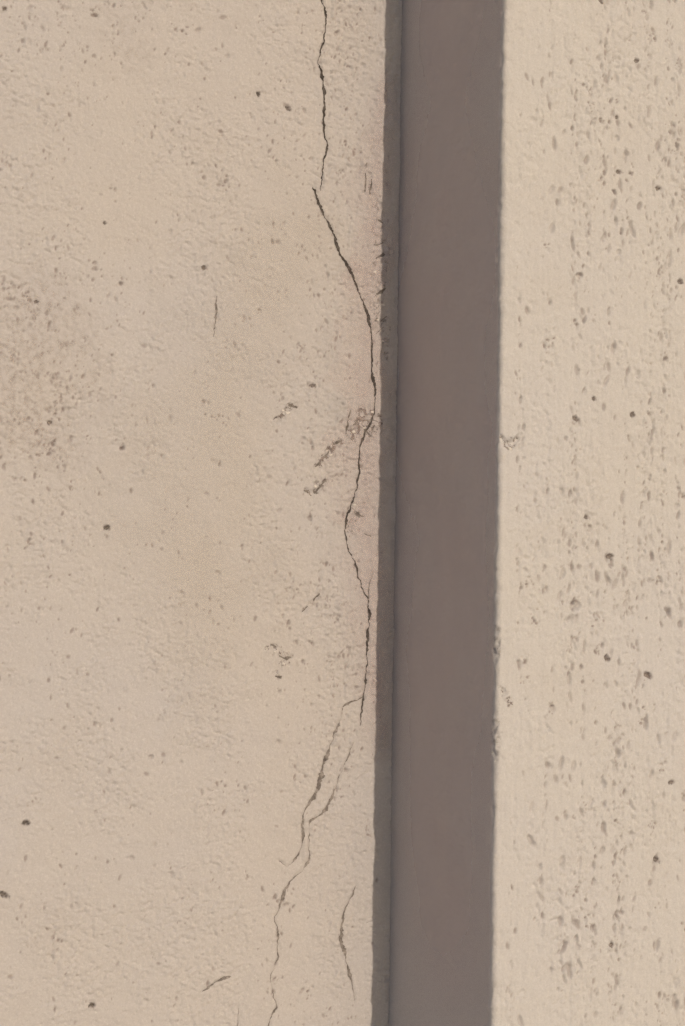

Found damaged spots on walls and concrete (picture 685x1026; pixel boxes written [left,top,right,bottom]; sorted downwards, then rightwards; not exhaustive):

crack [268,0,377,1026]